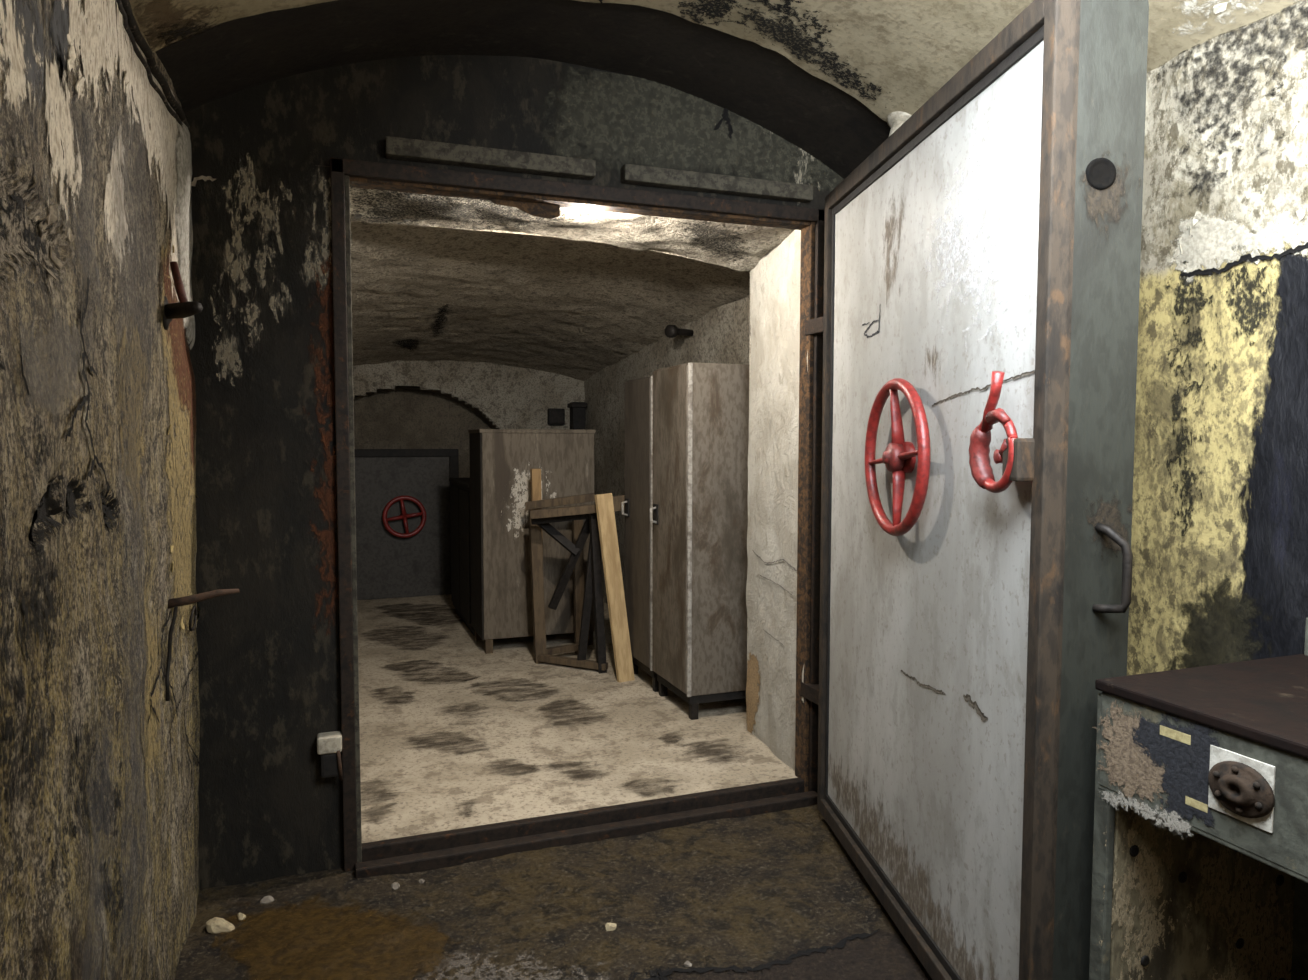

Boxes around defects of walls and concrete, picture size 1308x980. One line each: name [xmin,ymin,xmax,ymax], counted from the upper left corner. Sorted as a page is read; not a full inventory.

leakage [0,0,76,102]
leakage [669,0,904,106]
leakage [1155,3,1308,203]
leakage [210,153,303,386]
leakage [302,171,332,288]
peeling [1170,203,1308,282]
crack [1180,242,1308,277]
peeling [0,0,200,807]
leakage [1163,249,1275,536]
leakage [0,488,176,980]
crack [657,929,880,980]